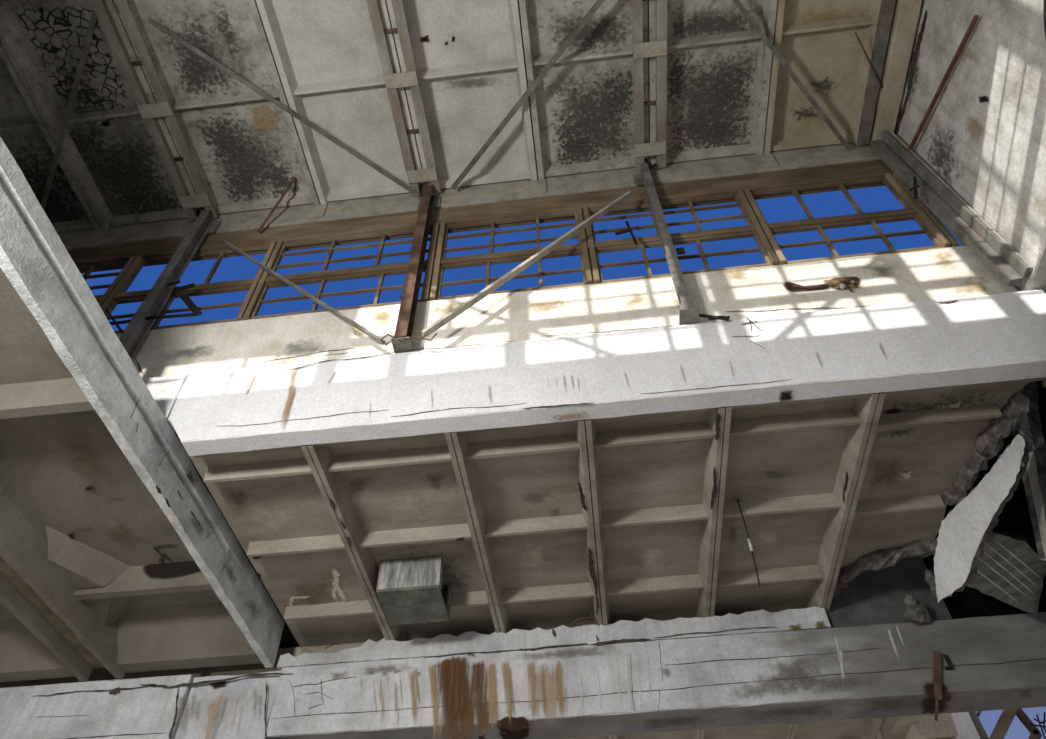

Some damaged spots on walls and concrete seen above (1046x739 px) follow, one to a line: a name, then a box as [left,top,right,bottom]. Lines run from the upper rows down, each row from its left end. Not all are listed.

mould [17,147,83,223]
damp [196,114,299,202]
mould [555,70,634,164]
mould [668,53,754,151]
spalling [943,390,1030,506]
crack [577,482,587,511]
spalling [832,537,937,601]
crack [424,548,1046,710]
crack [36,673,444,739]
rust [411,657,514,739]
rust [528,662,564,717]
rust [921,683,950,715]